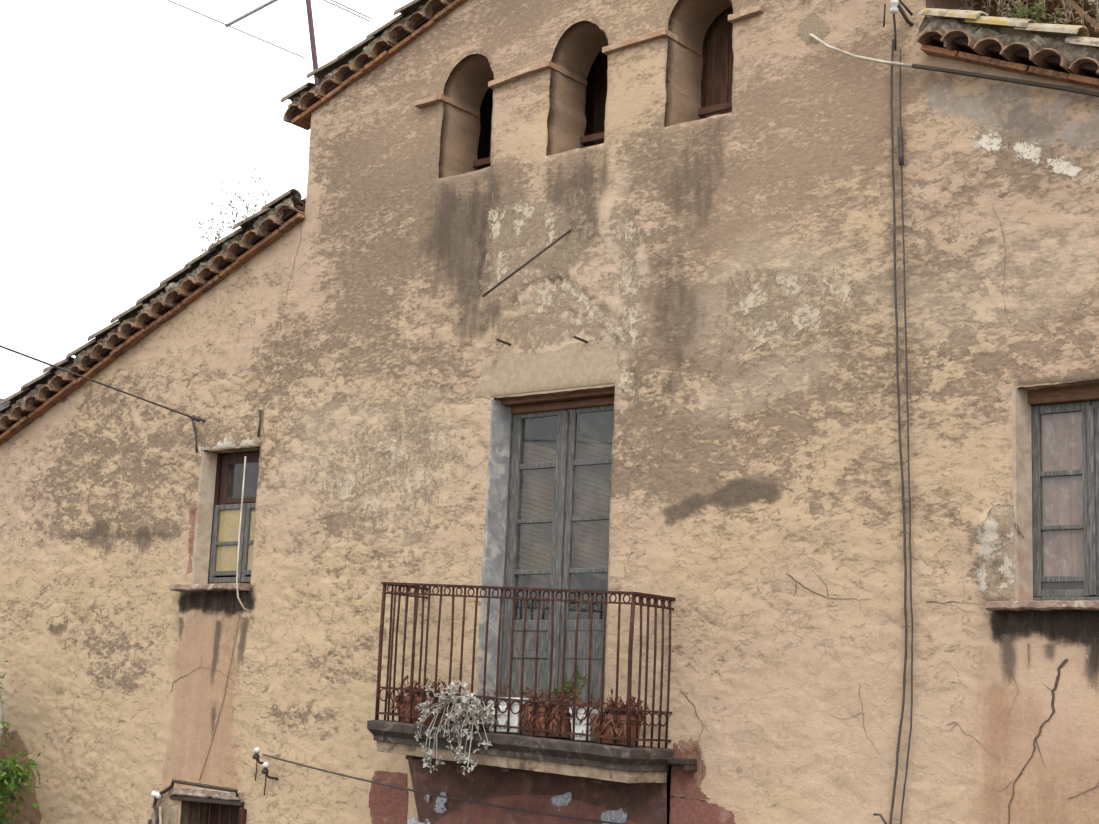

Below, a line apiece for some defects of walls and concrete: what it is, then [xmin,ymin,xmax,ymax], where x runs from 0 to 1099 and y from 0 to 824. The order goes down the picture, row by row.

peeling [972,127,1082,181]
damp [428,175,499,338]
damp [1001,634,1015,677]
damp [1085,637,1099,679]
crack [948,673,1018,757]
crack [988,659,1068,824]
peeling [551,792,572,812]
peeling [601,806,627,824]
flaking render [670,738,736,824]